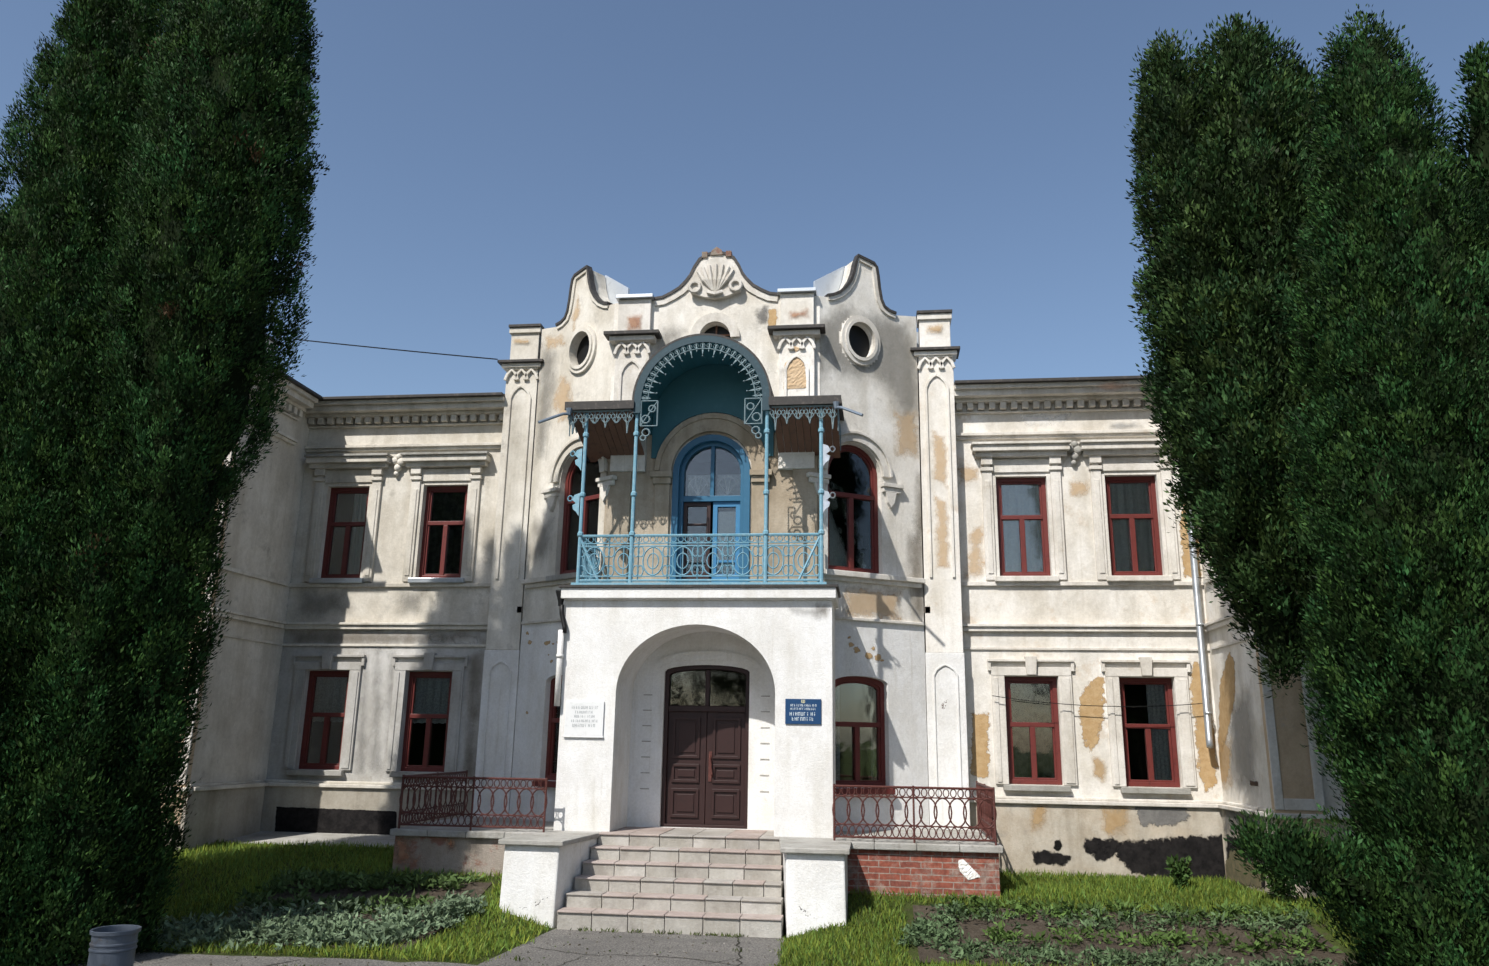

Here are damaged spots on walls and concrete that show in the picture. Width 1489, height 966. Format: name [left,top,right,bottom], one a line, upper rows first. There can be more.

flaking render [897,415,917,454]
flaking render [934,435,976,567]
flaking render [966,529,983,576]
flaking render [845,589,898,620]
flaking render [970,713,990,778]
flaking render [1078,677,1107,779]
flaking render [1189,652,1235,792]